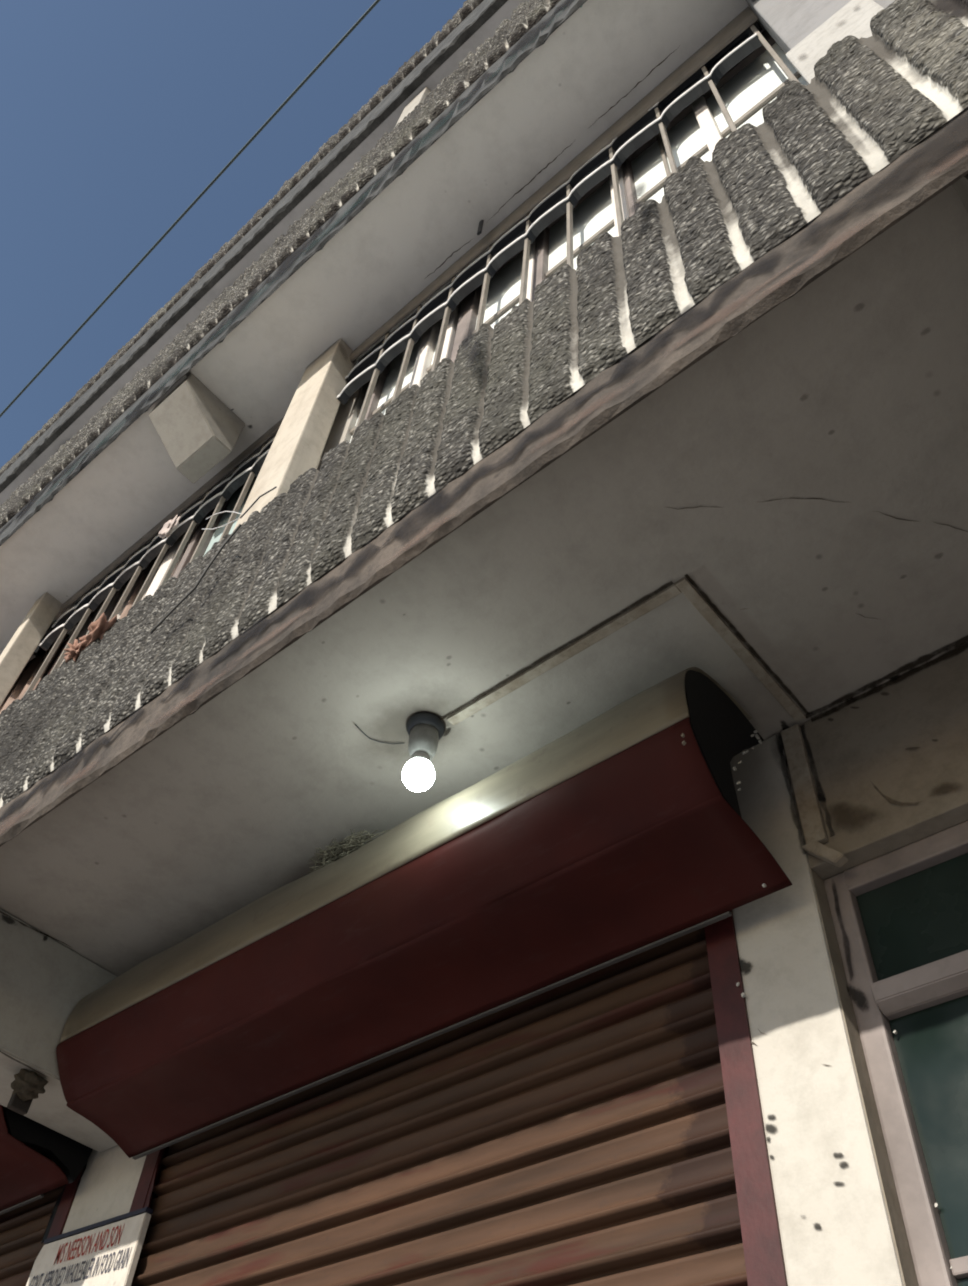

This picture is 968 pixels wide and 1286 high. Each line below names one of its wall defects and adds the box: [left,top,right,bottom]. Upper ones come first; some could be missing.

water stain [808,112,968,237]
water stain [211,257,774,667]
water stain [0,708,142,820]